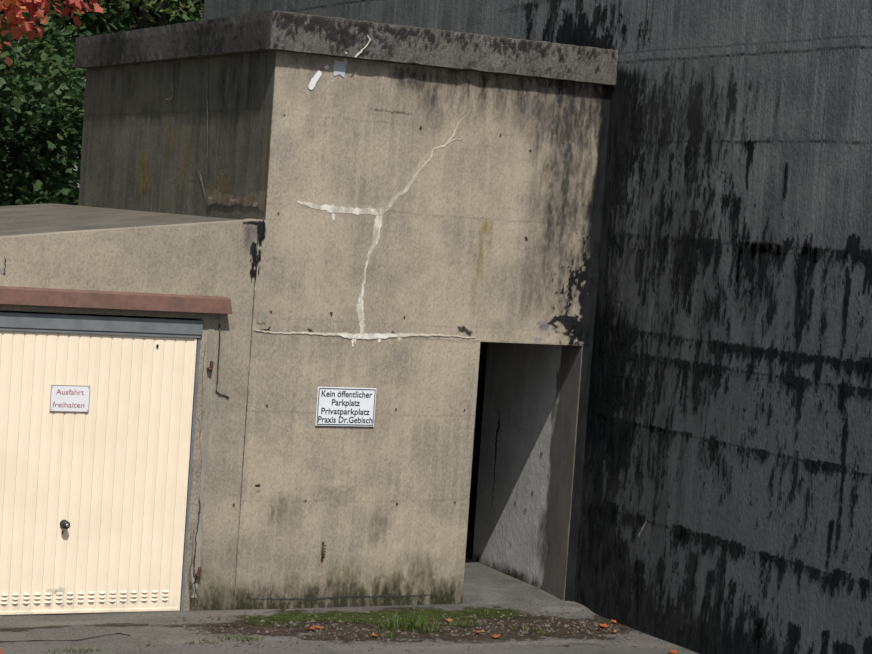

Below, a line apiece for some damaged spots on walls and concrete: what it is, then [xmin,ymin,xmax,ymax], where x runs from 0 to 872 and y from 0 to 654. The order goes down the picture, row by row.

spalling [205,189,265,211]
leakage [244,220,266,282]
crack [297,110,471,334]
leakage [539,61,872,654]
leakage [190,583,463,610]
leakage [472,556,542,588]